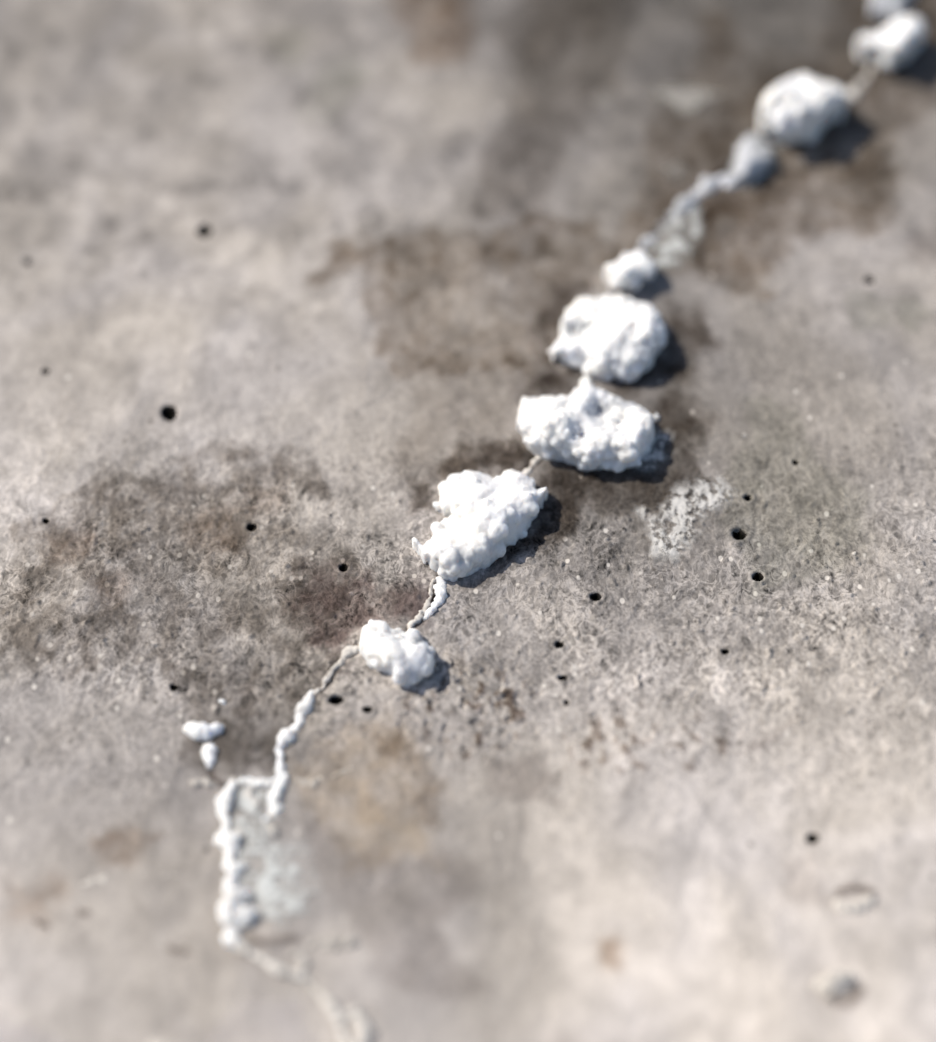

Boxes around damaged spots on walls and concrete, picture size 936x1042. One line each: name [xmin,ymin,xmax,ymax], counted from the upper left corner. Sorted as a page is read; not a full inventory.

efflorescence [855,0,926,69]
crack [845,60,877,104]
efflorescence [730,73,846,186]
crack [634,174,741,256]
leakage [412,212,710,582]
crack [522,454,543,476]
leakage [637,479,730,558]
crack [407,576,448,629]
efflorescence [359,619,435,688]
efflorescence [183,721,224,743]
efflorescence [237,788,303,917]
crack [189,645,374,1042]